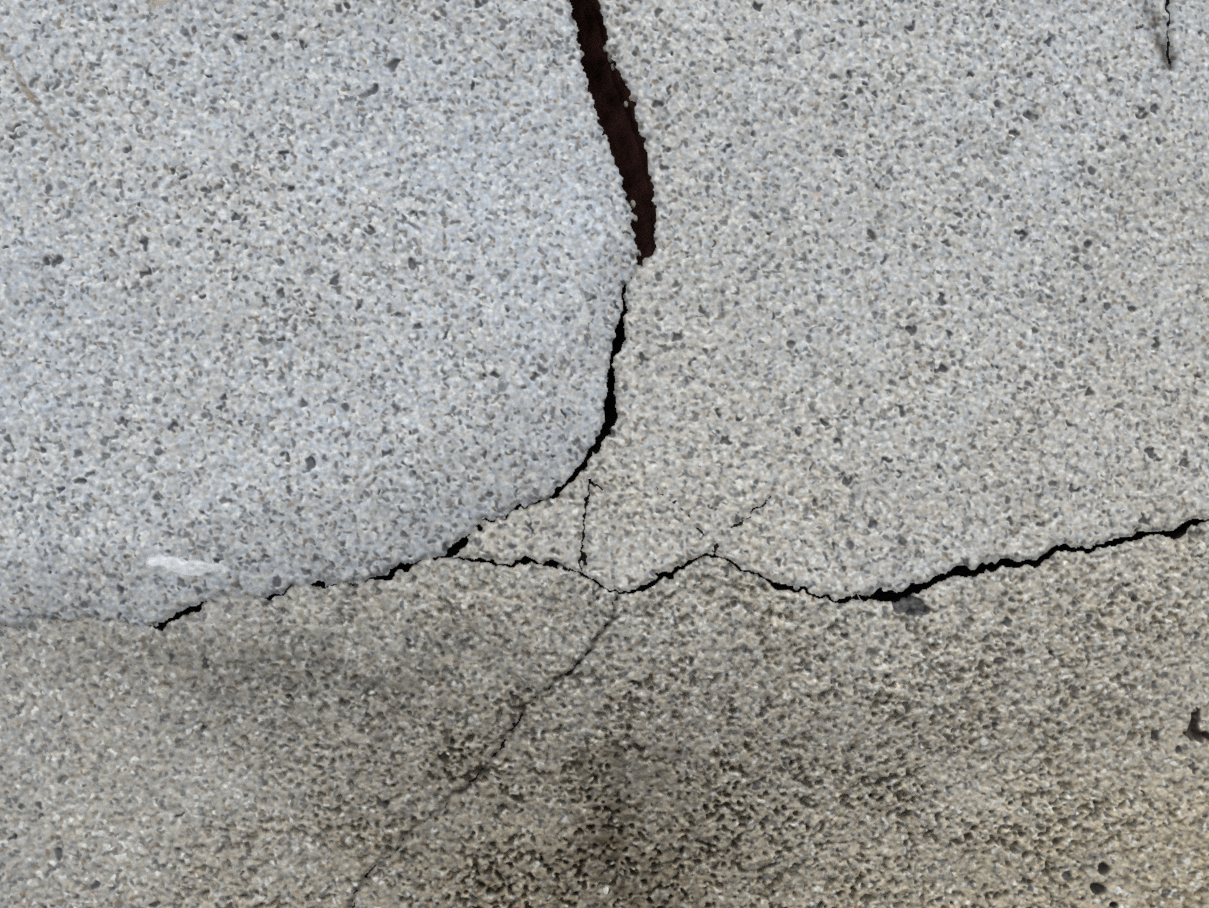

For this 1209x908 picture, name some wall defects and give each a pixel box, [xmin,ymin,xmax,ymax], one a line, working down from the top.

crack [150,601,207,631]
crack [265,0,1209,908]